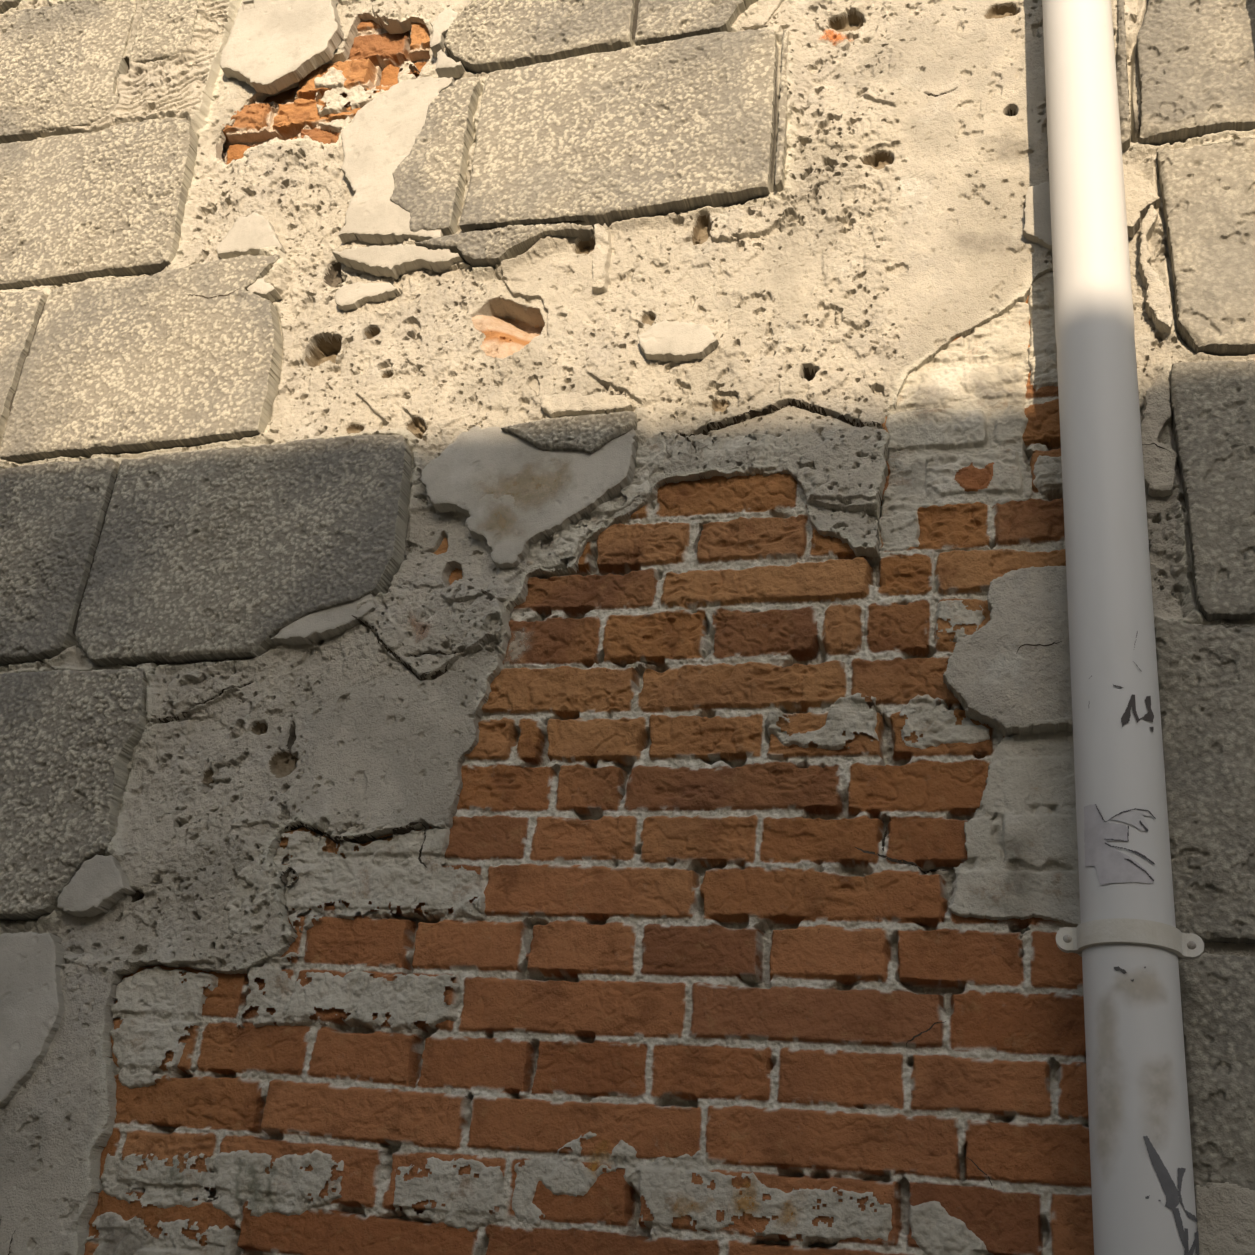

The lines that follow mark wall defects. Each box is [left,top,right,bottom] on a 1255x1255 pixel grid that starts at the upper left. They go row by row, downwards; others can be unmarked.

peeling [220,0,490,244]
spalling [1111,0,1255,628]
spalling [0,274,153,428]
peeling [420,426,638,569]
peeling [635,431,668,472]
peeling [671,436,693,464]
crack [678,399,885,447]
spalling [954,462,994,492]
peeling [1033,455,1063,501]
peeling [270,593,376,647]
peeling [120,813,180,888]
peeling [226,866,277,935]